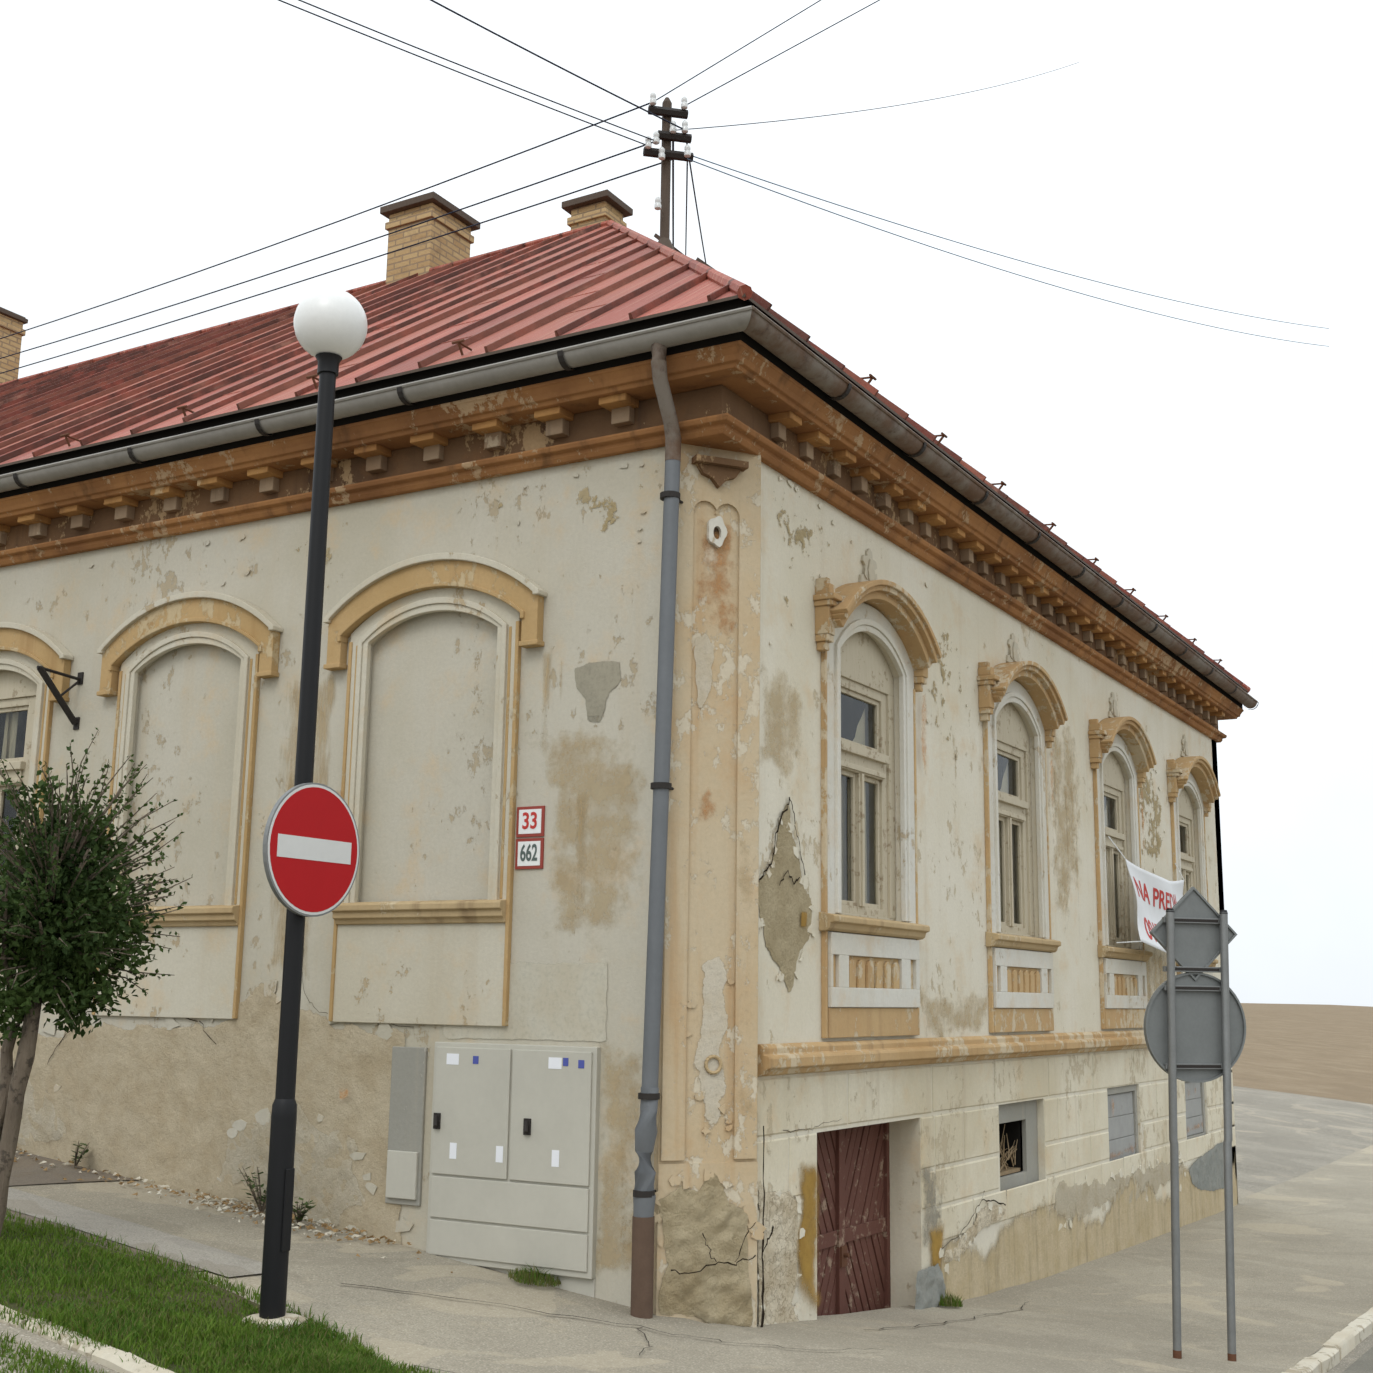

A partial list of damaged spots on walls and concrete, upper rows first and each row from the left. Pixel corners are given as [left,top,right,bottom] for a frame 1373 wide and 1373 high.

peeling [694,633,714,719]
spalling [758,803,815,992]
peeling [686,956,735,1135]
spalling [654,1169,805,1327]
spalling [939,1201,1006,1275]